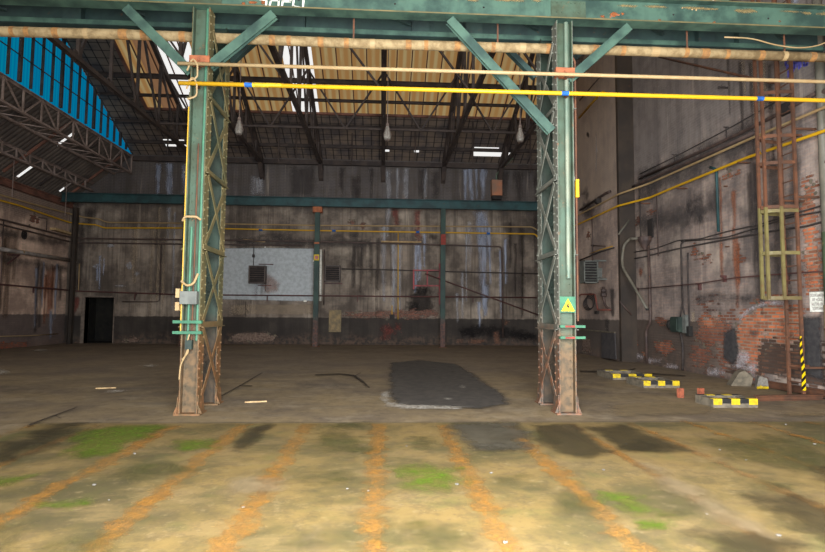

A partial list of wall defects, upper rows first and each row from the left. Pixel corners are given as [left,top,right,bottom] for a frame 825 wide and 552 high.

damp [464,169,486,198]
damp [415,235,425,292]
damp [478,214,506,325]
peeling [799,174,824,295]
peeling [689,291,825,388]